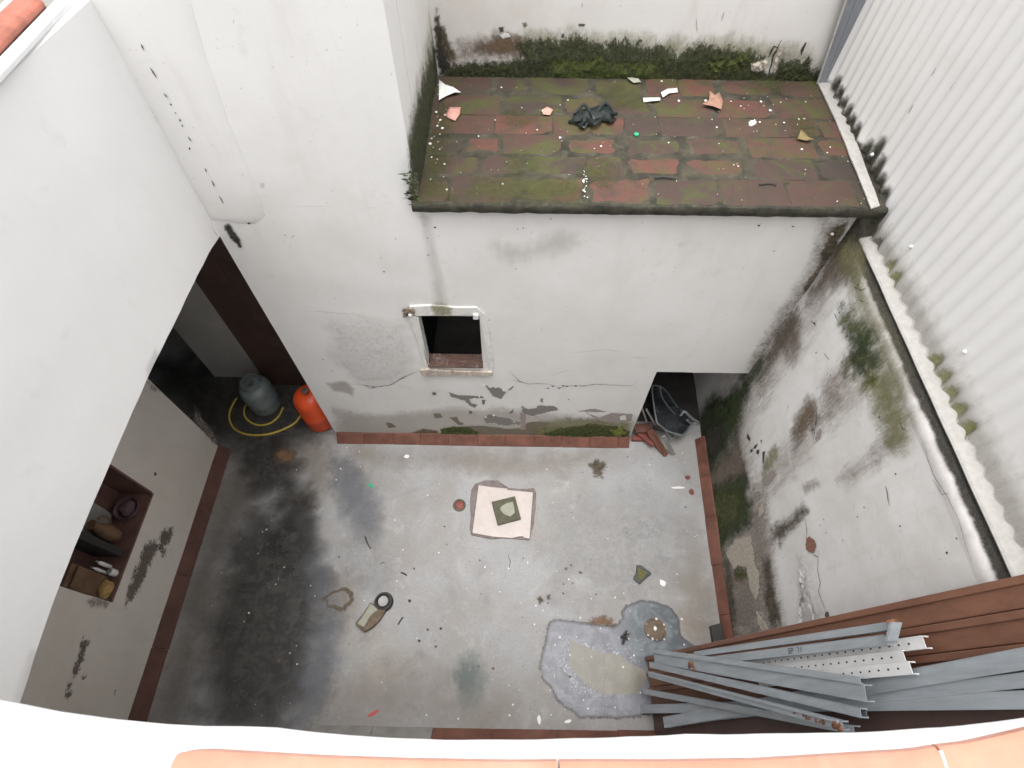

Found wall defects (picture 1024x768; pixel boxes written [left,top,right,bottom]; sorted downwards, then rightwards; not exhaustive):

leakage [427,16,559,76]
leakage [753,221,882,371]
peeling [432,384,558,430]
leakage [791,400,820,444]
leakage [154,356,335,727]
leakage [771,508,808,545]
crack [799,528,829,617]